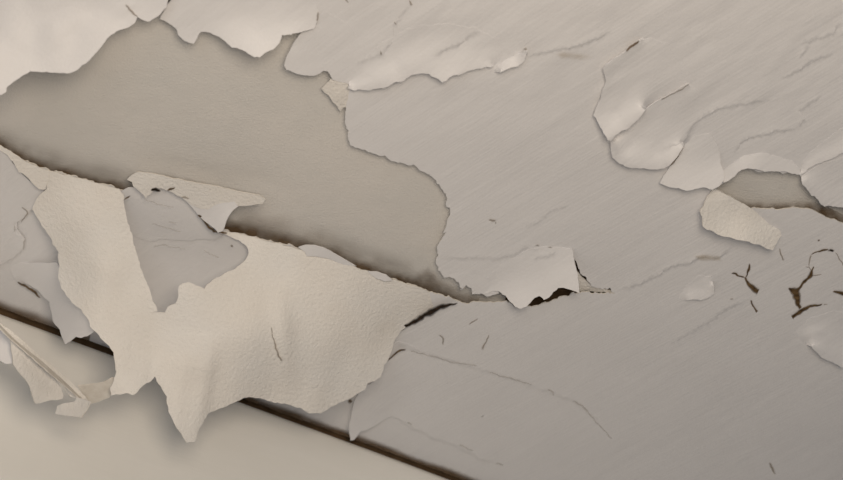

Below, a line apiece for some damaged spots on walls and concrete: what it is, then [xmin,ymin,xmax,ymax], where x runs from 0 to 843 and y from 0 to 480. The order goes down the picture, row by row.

peeling [0,0,611,443]
peeling [593,38,843,251]
crack [732,264,759,312]
crack [789,240,843,318]